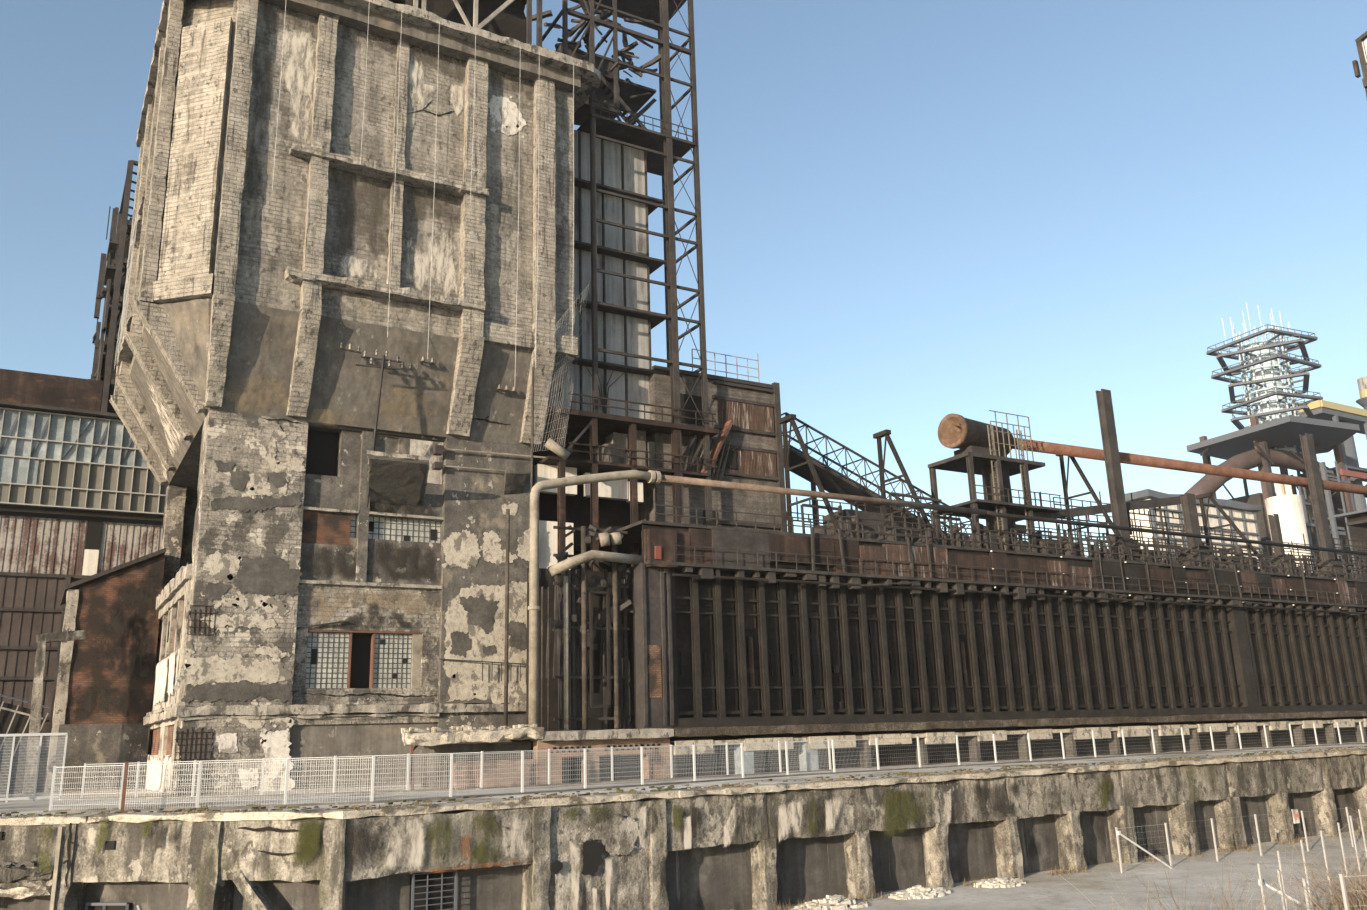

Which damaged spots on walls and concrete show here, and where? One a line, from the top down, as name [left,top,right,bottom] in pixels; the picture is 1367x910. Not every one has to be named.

water stain [246,3,318,200]
water stain [408,48,465,115]
peeling [488,95,526,139]
water stain [333,169,391,278]
water stain [406,189,461,295]
peeling [211,424,306,513]
peeling [437,524,530,569]
peeling [501,502,519,516]
peeling [145,551,303,795]
peeling [443,581,527,704]
water stain [293,820,319,865]
water stain [779,797,841,841]